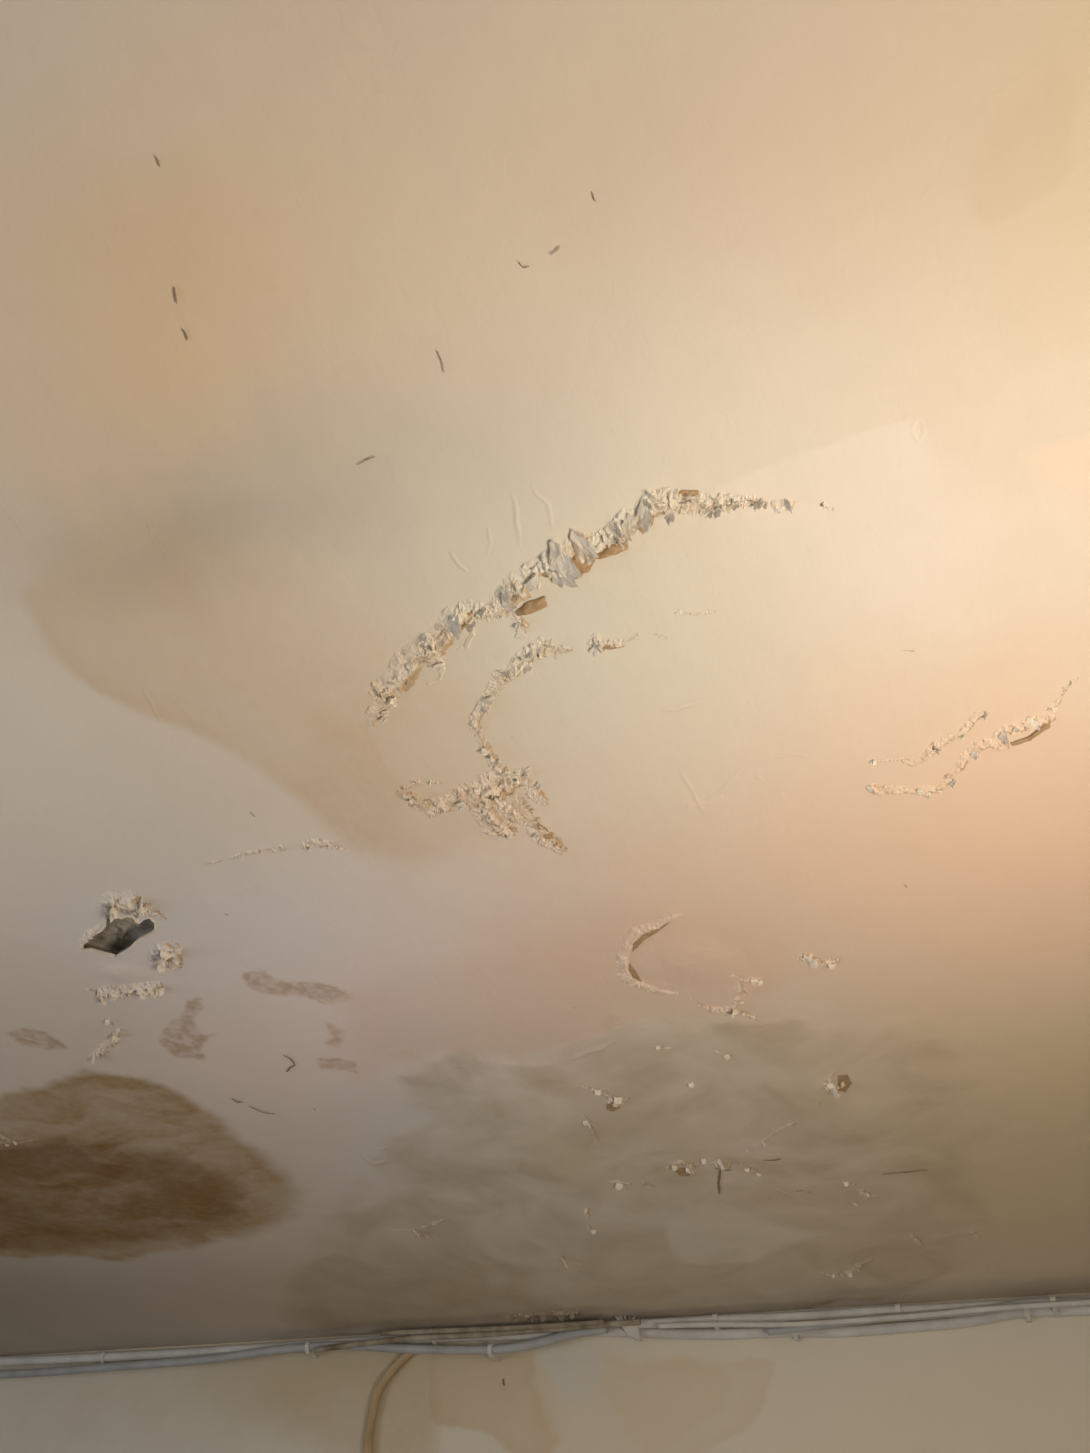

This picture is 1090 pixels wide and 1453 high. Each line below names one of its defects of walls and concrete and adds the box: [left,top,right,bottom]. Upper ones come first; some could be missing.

peeling [364,486,795,856]
peeling [865,676,1078,798]
spalling [77,889,184,1064]
peeling [615,913,763,1021]
water stain [0,885,1032,1453]
peeling [580,1085,630,1112]
peeling [603,1122,797,1191]
peeling [814,1073,852,1107]